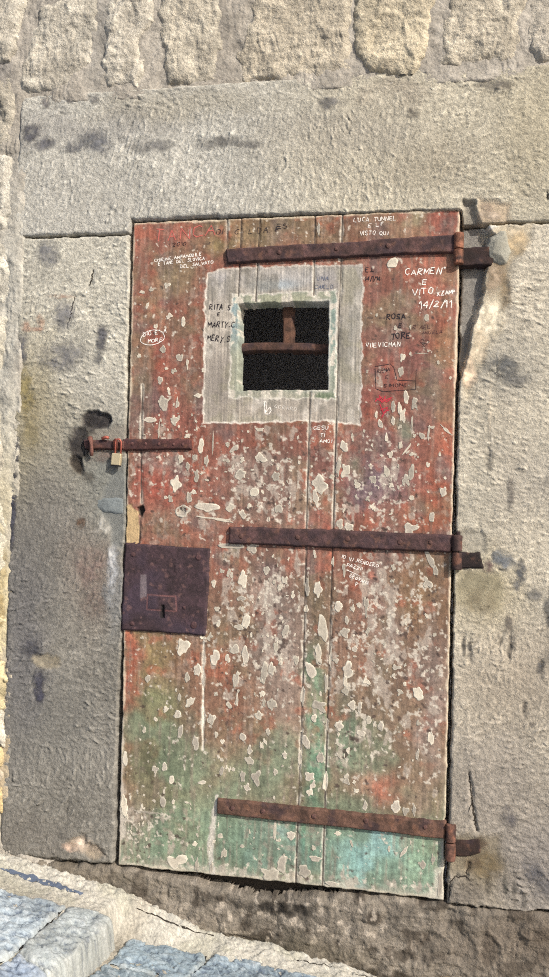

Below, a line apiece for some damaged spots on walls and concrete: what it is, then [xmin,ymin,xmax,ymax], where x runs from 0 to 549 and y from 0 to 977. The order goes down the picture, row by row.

peeling [142,395,179,424]
peeling [399,390,418,424]
peeling [335,440,350,478]
peeling [170,470,246,523]
peeling [311,474,328,508]
peeling [177,638,191,656]
peeling [184,644,249,688]
peeling [300,614,328,714]
peeling [298,735,328,791]
peeling [120,794,128,818]
peeling [167,855,188,870]
peeling [260,855,287,881]